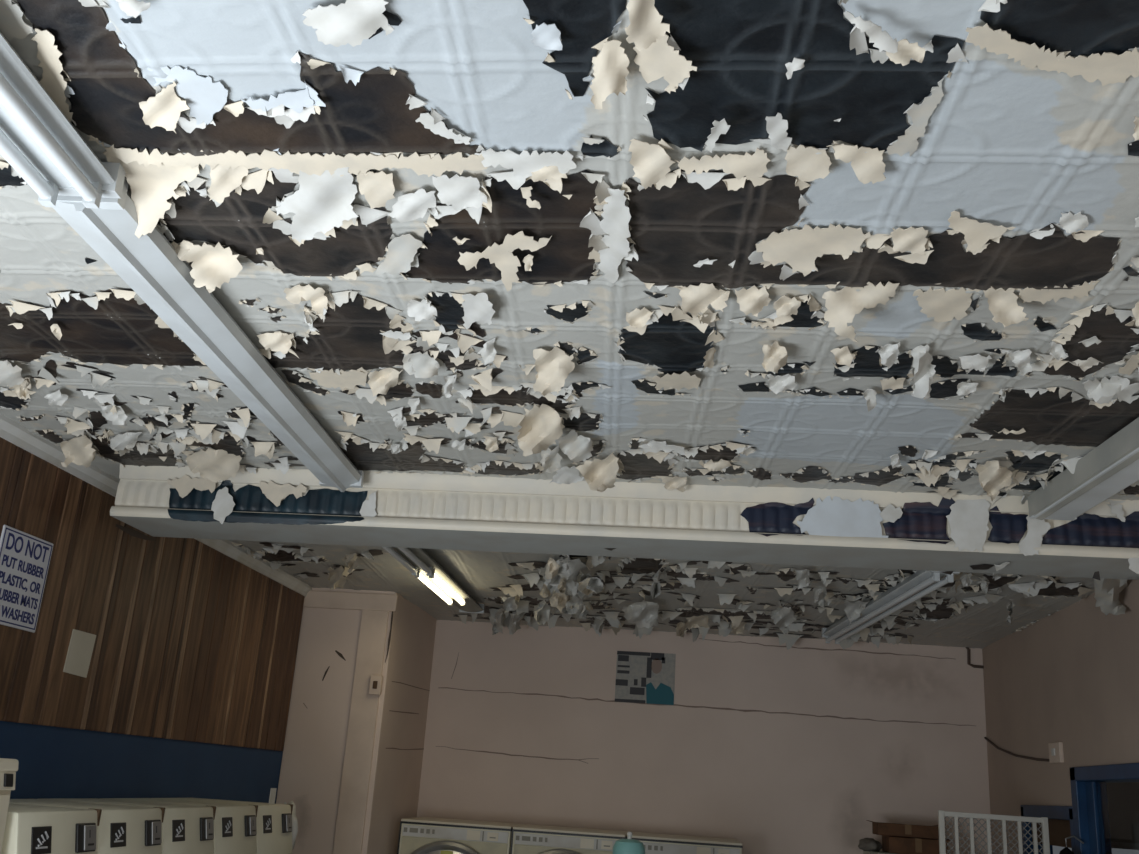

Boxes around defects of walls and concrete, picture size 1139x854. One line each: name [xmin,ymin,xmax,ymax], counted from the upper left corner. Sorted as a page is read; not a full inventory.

peeling [0,0,1139,650]
crack [385,611,974,726]